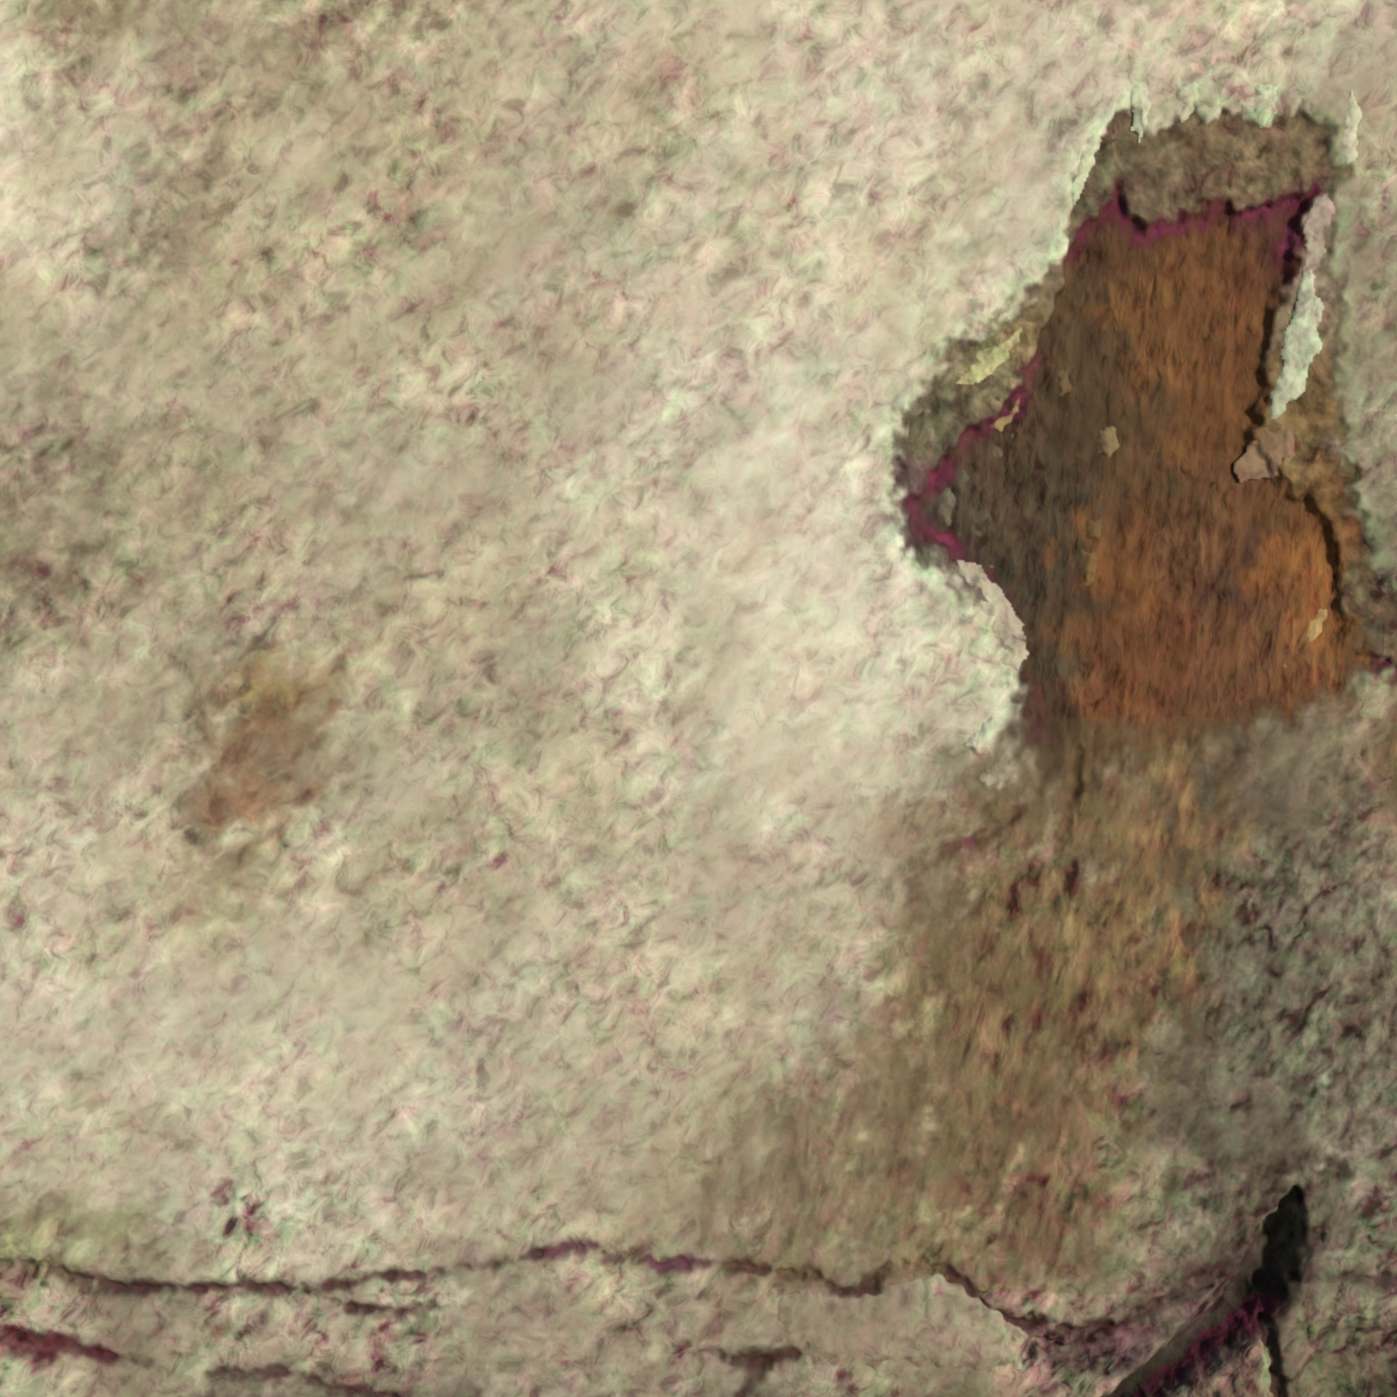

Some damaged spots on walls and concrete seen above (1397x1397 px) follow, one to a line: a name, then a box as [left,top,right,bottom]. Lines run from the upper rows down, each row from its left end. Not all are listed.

spalling [892,76,1397,794]
leakage [1024,796,1397,1373]
crack [0,1327,119,1362]
crack [0,1256,439,1317]
crack [207,1364,400,1397]
crack [494,1215,1302,1397]